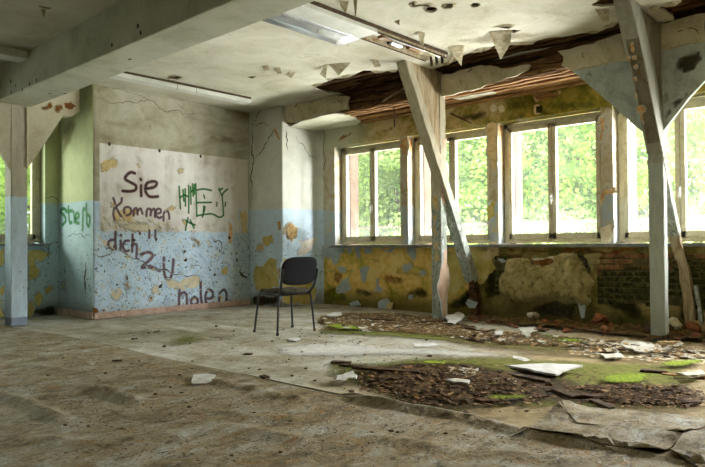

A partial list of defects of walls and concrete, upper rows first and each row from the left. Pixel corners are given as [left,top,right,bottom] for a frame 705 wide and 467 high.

peeling [311,63,357,87]
peeling [431,46,464,71]
water stain [677,52,702,73]
peeling [41,101,76,113]
crack [96,87,215,117]
crack [250,110,327,207]
peeling [27,248,67,317]
peeling [97,201,316,306]
flaking render [494,254,522,295]
flaking render [597,252,650,307]
flaking render [668,254,683,306]
flaking render [685,254,705,310]